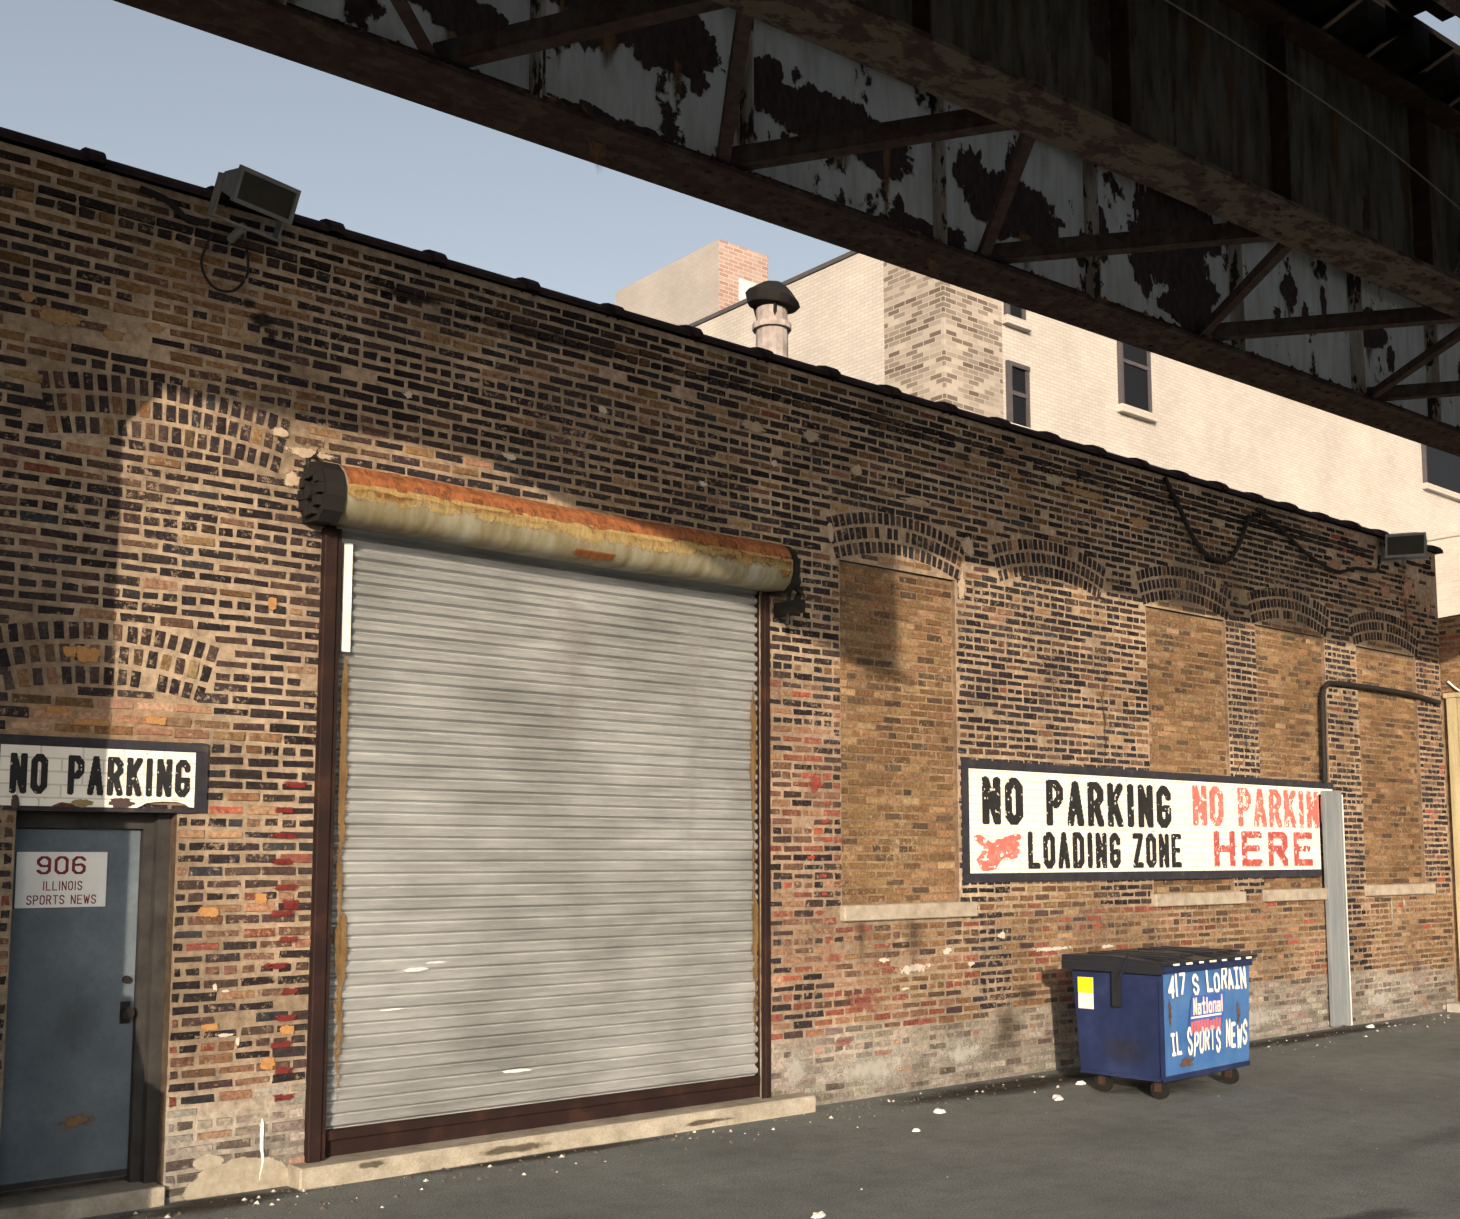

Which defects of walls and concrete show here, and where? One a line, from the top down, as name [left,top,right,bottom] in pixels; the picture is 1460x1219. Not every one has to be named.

peeling [408,0,509,37]
peeling [579,15,725,97]
peeling [547,92,680,143]
peeling [754,54,880,138]
peeling [853,146,915,183]
peeling [877,144,1109,247]
peeling [1129,182,1213,231]
peeling [1128,246,1222,332]
peeling [1274,271,1327,318]
peeling [1363,328,1395,373]
corrosion [339,465,793,578]